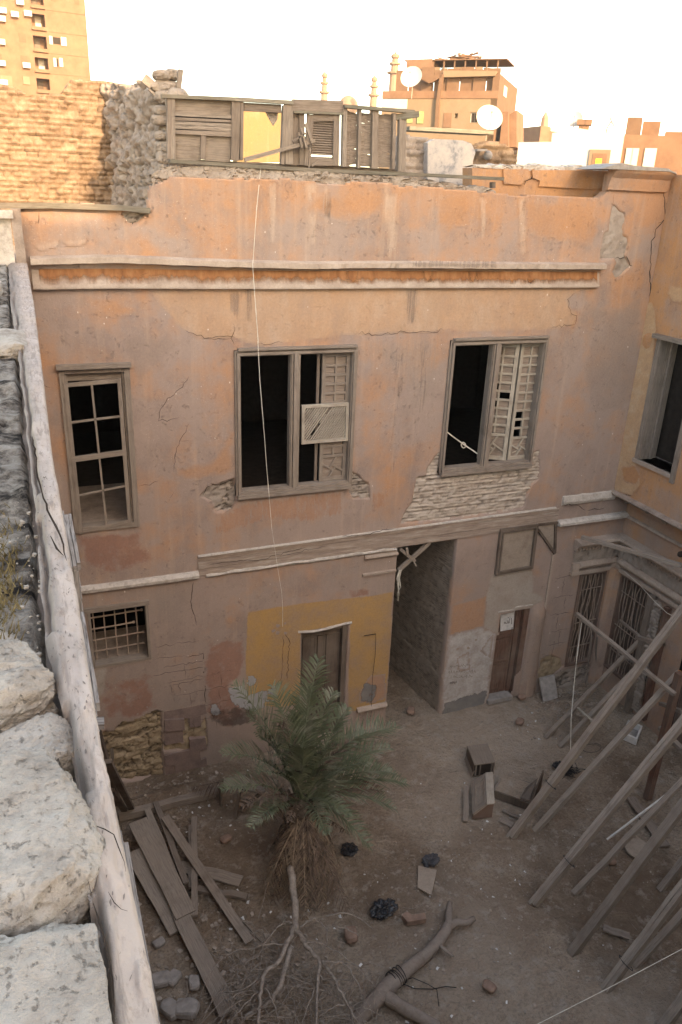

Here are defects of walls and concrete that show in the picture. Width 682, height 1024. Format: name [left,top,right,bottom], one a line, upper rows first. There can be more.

spalling [600,202,631,281]
crack [619,193,665,296]
spalling [201,478,235,514]
spalling [401,451,539,524]
spalling [58,667,209,783]